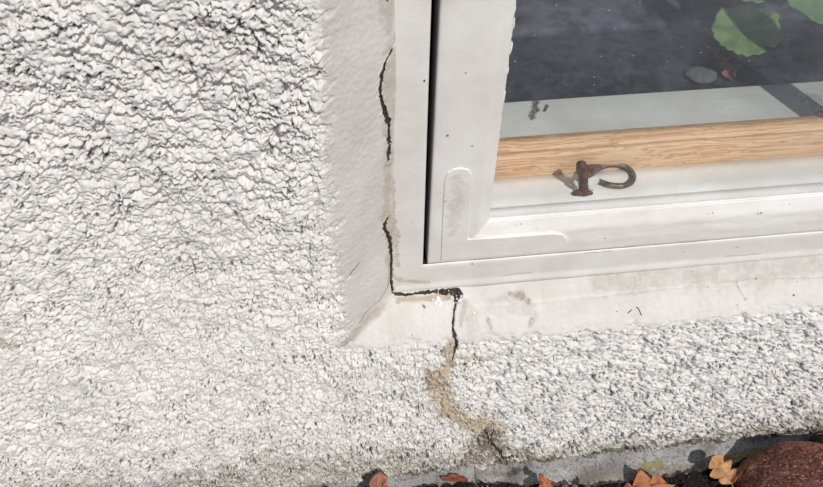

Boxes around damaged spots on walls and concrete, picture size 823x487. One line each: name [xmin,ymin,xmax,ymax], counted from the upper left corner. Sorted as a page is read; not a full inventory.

crack [378,35,395,162]
crack [359,217,459,360]
crack [484,429,516,459]